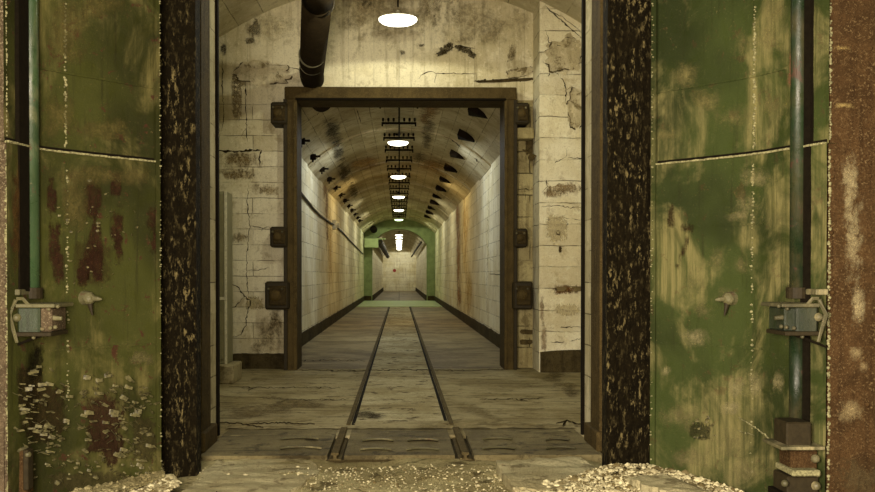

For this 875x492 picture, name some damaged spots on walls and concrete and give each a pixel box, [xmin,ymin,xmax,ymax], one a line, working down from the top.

crack [219,62,262,165]
spalling [232,60,293,118]
spalling [437,43,476,59]
spalling [544,32,581,75]
crack [546,6,581,105]
spalling [567,87,581,130]
corrosion [49,225,64,281]
corrosion [77,173,123,286]
crack [234,185,270,337]
peeling [4,149,162,492]